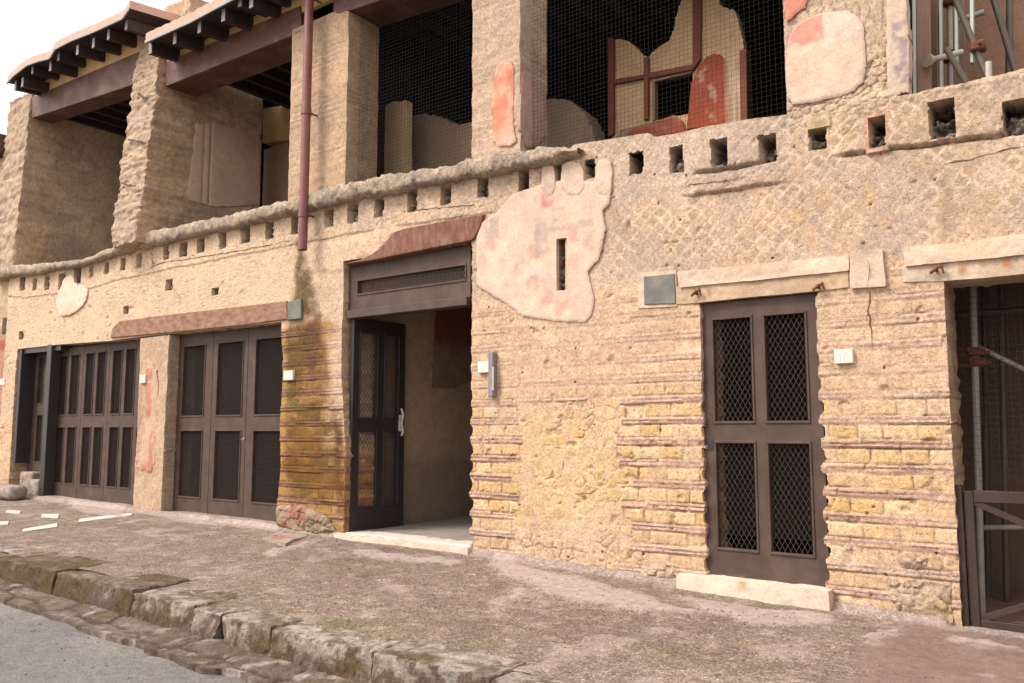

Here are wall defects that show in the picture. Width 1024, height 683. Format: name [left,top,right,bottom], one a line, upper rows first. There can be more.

damp [286,251,341,503]
crack [865,260,873,349]